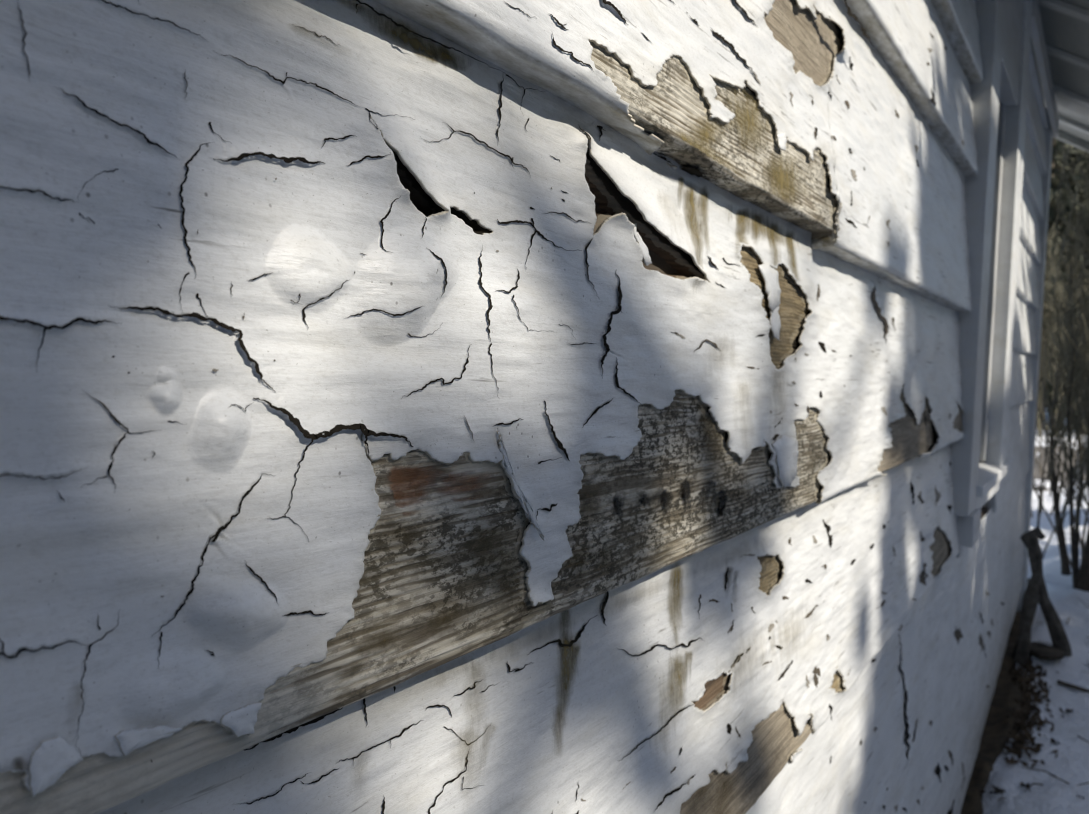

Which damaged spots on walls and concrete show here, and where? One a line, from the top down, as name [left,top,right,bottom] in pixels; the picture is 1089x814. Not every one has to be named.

crack [550,14,594,72]
crack [712,30,758,82]
peeling [764,0,853,101]
peeling [590,41,870,244]
crack [0,0,542,669]
crack [347,204,641,464]
peeling [585,156,725,288]
leakage [752,216,797,278]
peeling [740,246,821,369]
peeling [0,390,833,814]
crack [241,591,609,814]
leakage [671,654,692,701]